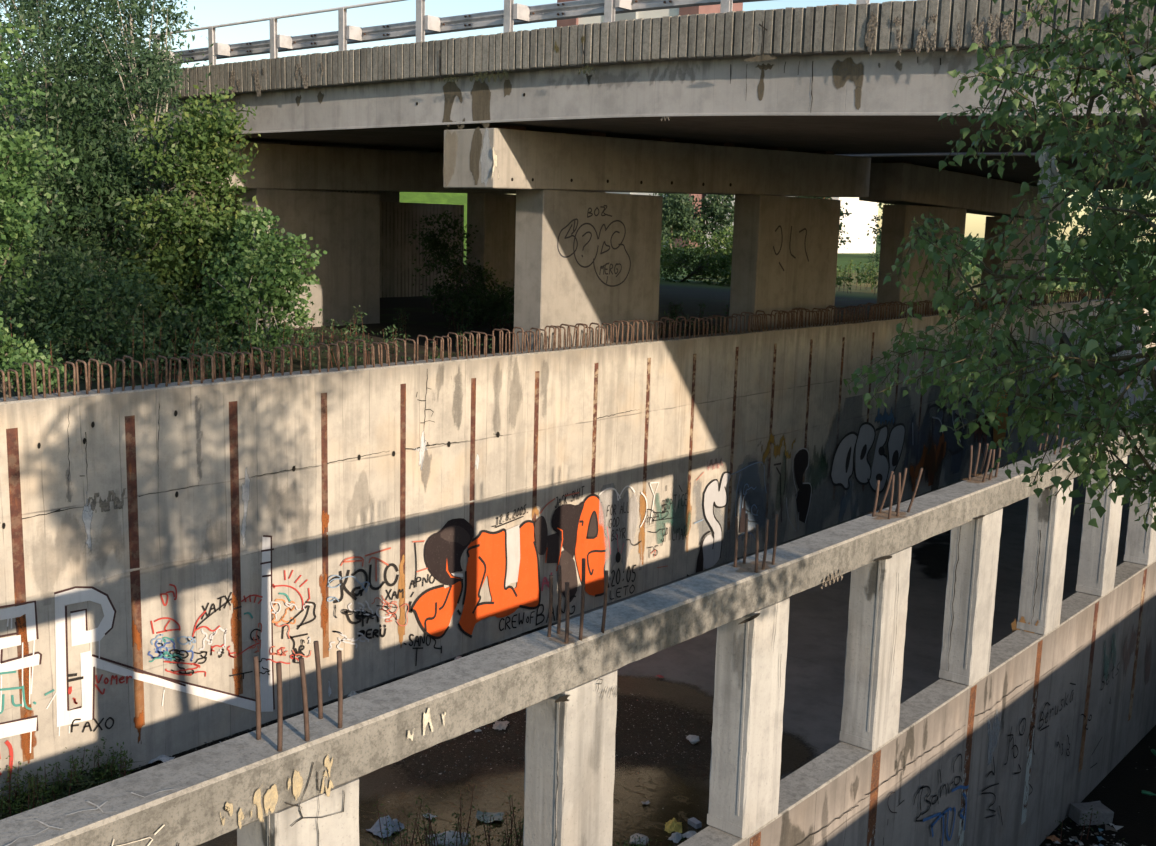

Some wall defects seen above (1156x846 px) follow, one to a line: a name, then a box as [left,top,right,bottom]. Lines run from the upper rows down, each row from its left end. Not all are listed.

damp [832,57,864,110]
damp [442,76,525,186]
rust [319,574,328,637]
rust [398,555,407,647]
rust [132,620,141,651]
rust [231,590,242,695]
rust [134,710,144,743]
peeling [220,770,303,829]
peeling [321,755,333,797]